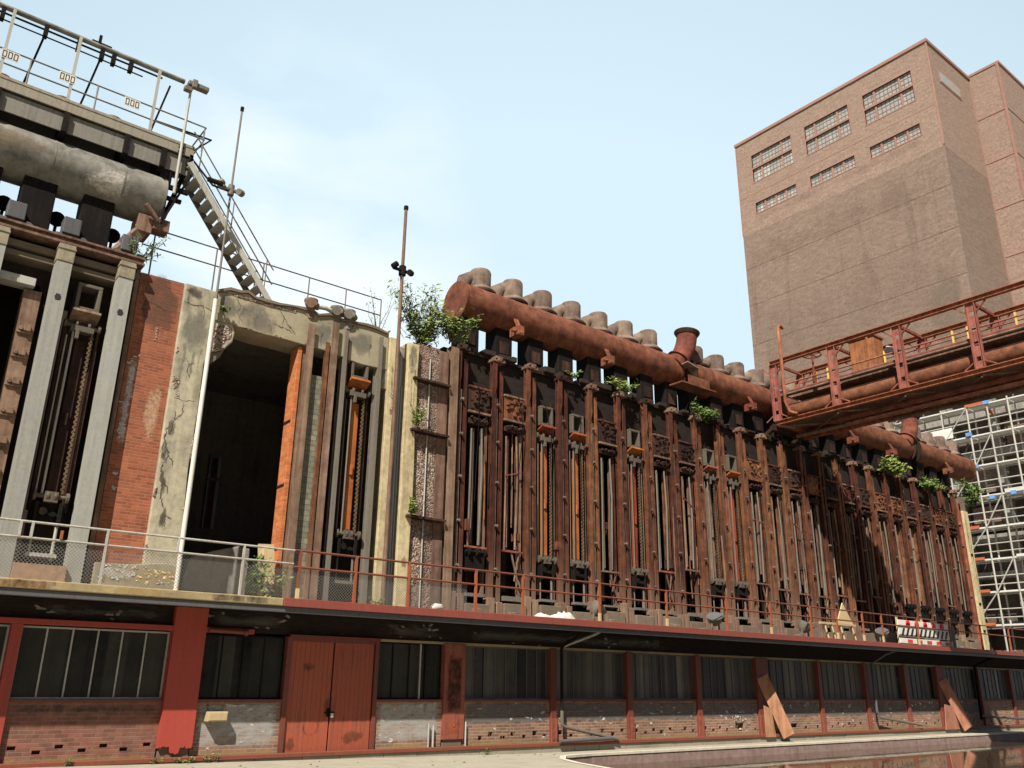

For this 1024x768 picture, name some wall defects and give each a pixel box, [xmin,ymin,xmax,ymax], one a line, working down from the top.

peeling [117,355,140,438]
crack [160,358,194,527]